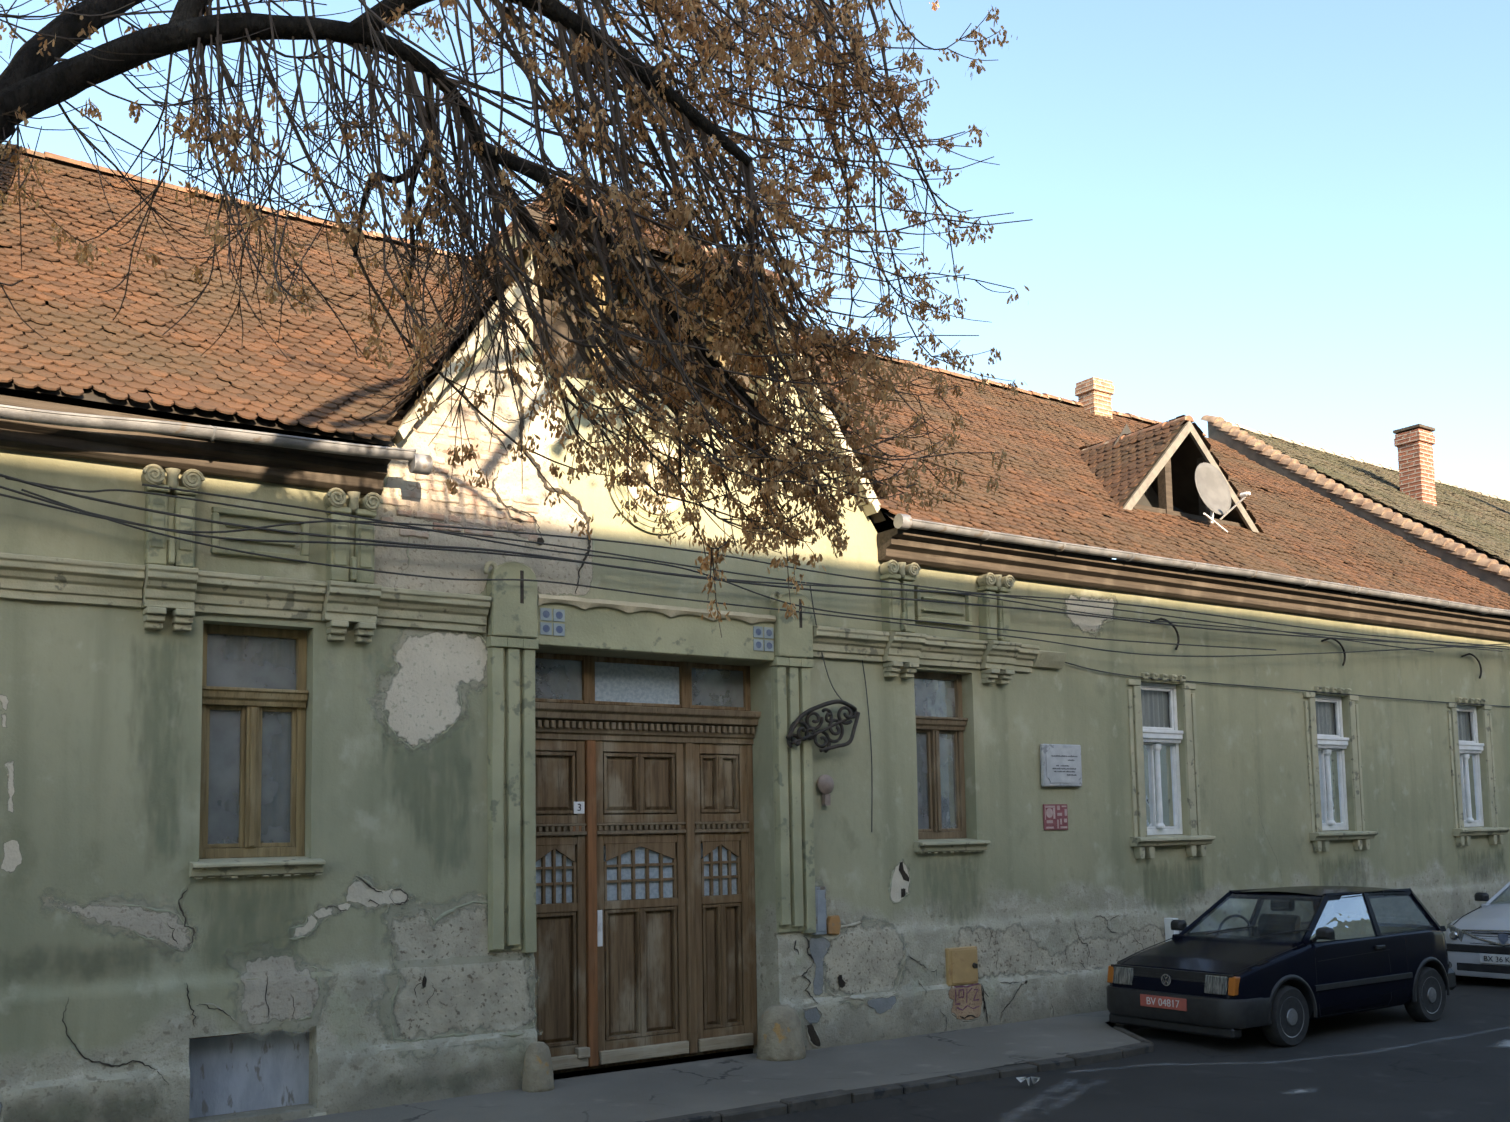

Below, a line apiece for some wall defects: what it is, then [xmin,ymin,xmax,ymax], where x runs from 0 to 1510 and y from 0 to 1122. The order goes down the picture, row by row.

flaking render [374,282,595,597]
peeling [370,628,488,750]
peeling [1,840,22,872]
crack [61,998,168,1084]
spalling [42,896,197,955]
spalling [225,876,537,1059]
spalling [803,917,908,1048]
spalling [888,860,911,904]